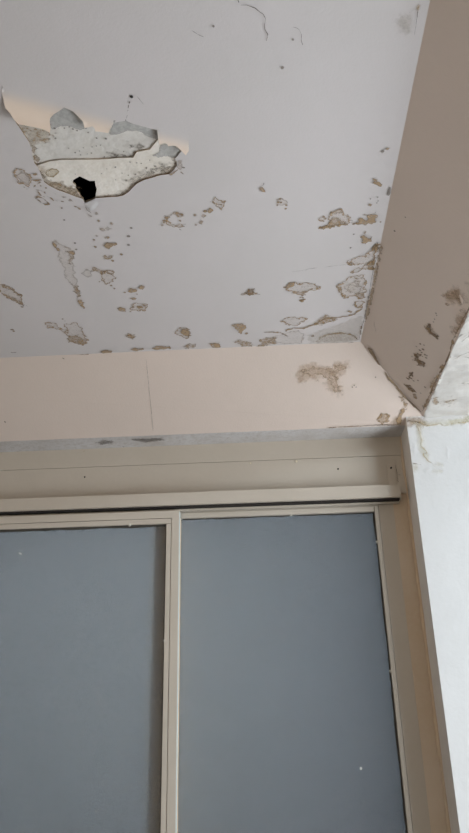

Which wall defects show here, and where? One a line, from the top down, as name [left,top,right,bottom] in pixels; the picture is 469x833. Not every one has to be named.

peeling [33,173,99,215]
peeling [359,243,383,338]
crack [351,309,469,412]